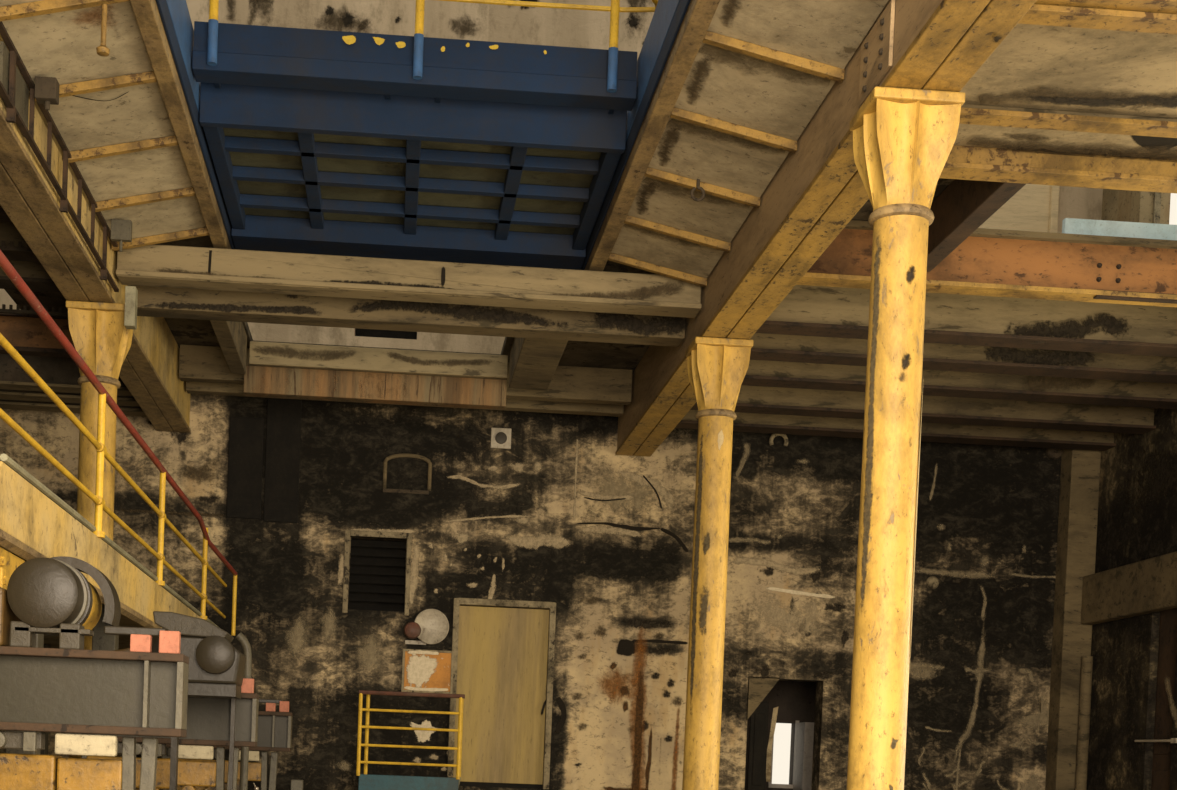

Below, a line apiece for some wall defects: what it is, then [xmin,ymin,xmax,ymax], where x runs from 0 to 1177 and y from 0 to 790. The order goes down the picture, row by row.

water stain [249,0,273,24]
water stain [915,556,994,618]
rust [602,631,652,790]
water stain [651,673,681,705]
water stain [909,662,945,679]
water stain [925,638,990,790]
rust [672,709,680,790]